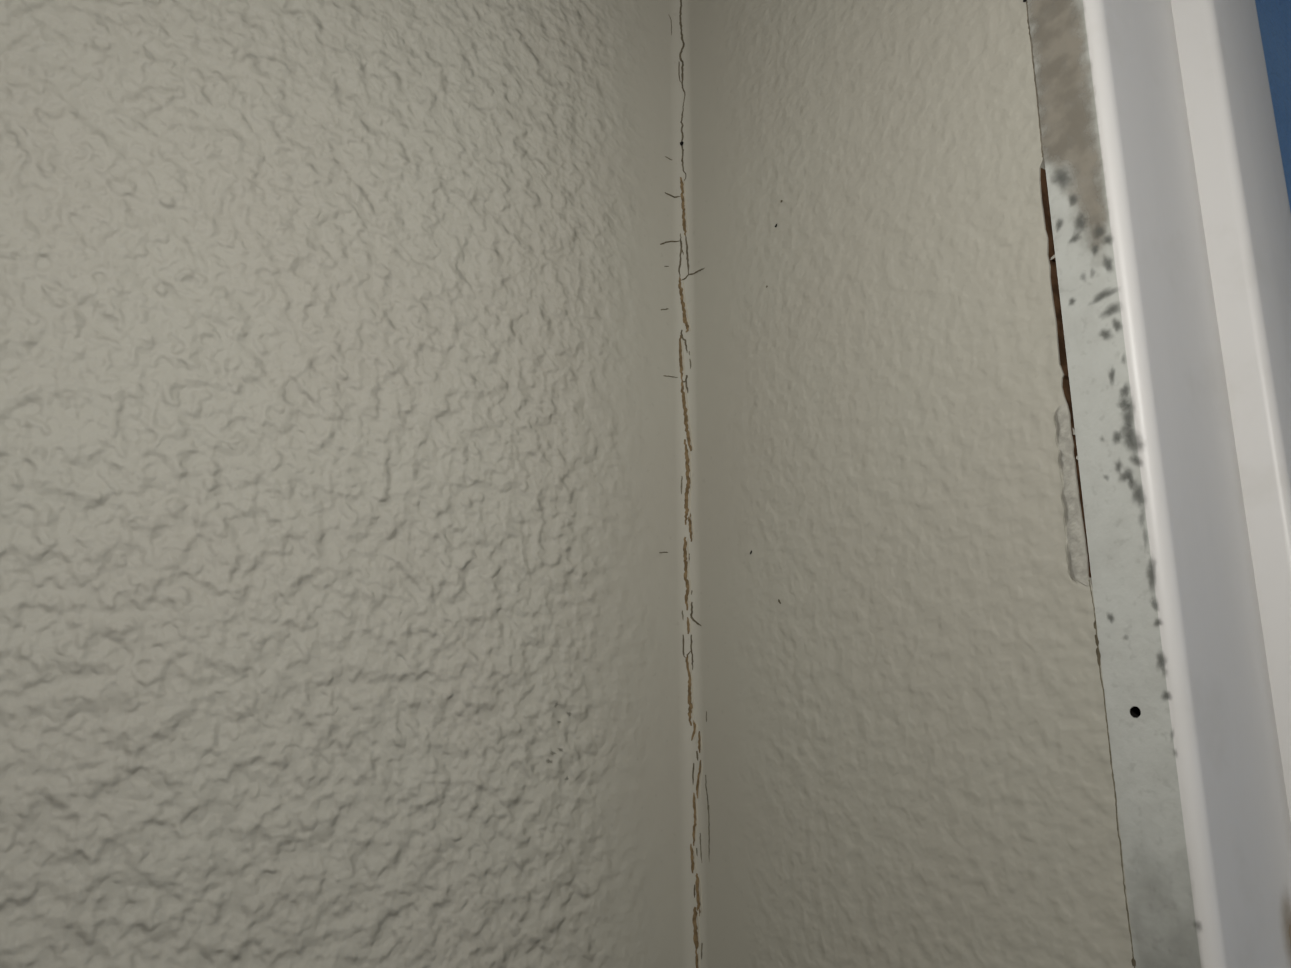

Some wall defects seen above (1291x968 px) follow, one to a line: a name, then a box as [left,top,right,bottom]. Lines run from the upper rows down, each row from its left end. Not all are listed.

mould [1072,218,1111,269]
mould [1096,292,1120,337]
crack [659,0,710,968]
mould [1110,372,1142,501]